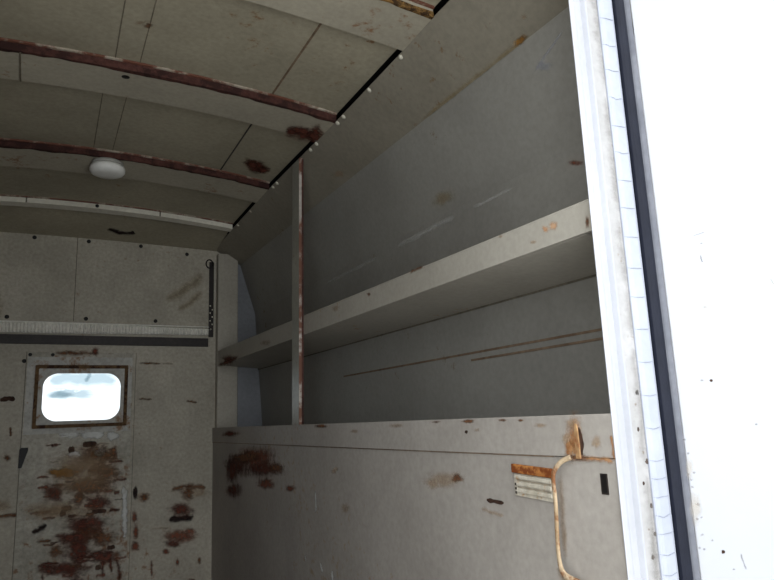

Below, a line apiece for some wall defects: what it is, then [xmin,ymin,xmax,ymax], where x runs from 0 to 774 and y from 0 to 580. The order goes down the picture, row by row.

corrosion [381,0,434,20]
corrosion [0,40,336,142]
corrosion [0,140,269,190]
corrosion [566,422,615,463]
corrosion [227,449,282,497]
corrosion [511,464,552,478]
corrosion [30,441,139,580]
corrosion [163,484,205,554]